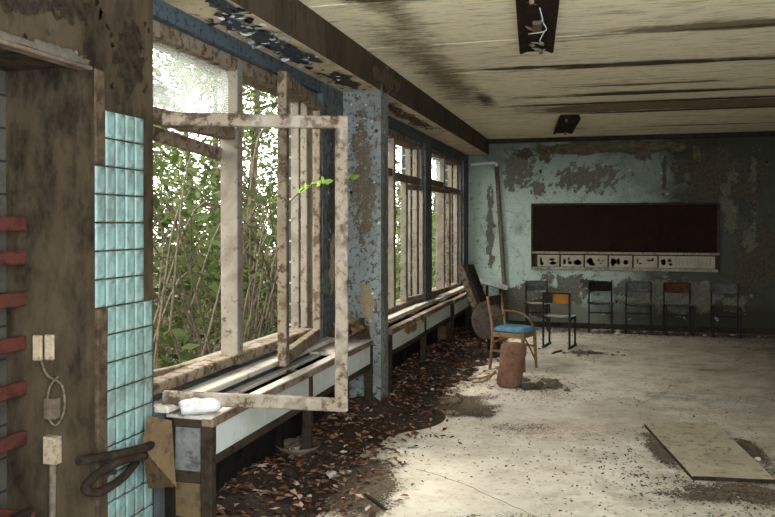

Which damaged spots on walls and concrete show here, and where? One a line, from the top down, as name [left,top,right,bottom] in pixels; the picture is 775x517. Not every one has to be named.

peeling [205,0,372,90]
water stain [343,0,492,106]
water stain [482,56,775,70]
water stain [593,19,775,36]
peeling [500,147,631,199]
peeling [484,184,497,275]
peeling [501,270,753,321]